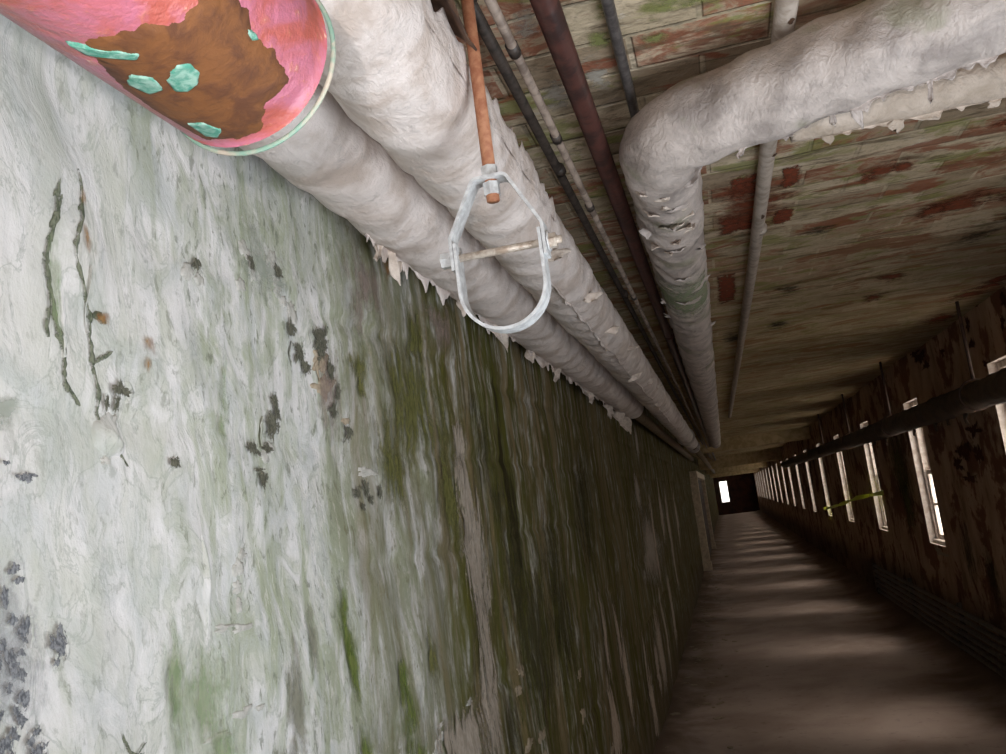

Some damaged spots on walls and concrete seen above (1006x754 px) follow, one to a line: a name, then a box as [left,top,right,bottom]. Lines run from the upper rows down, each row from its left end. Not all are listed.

peeling [711,165,800,235]
peeling [235,239,354,442]
spalling [16,472,38,484]
spalling [246,394,281,489]
damp [377,422,407,510]
spalling [0,562,49,754]
spalling [49,623,71,666]
damp [348,641,361,698]
damp [399,658,409,698]
damp [413,393,576,754]
damp [598,592,635,754]
damp [633,474,681,736]